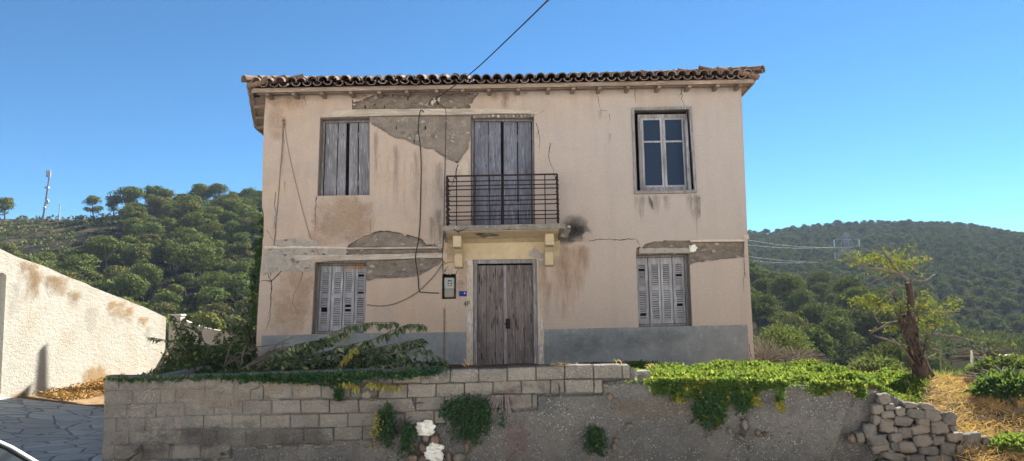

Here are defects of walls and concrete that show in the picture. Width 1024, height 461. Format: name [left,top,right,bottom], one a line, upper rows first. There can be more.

spalling [352,93,534,175]
spalling [261,230,442,282]
spalling [636,240,745,265]
crack [260,271,303,329]